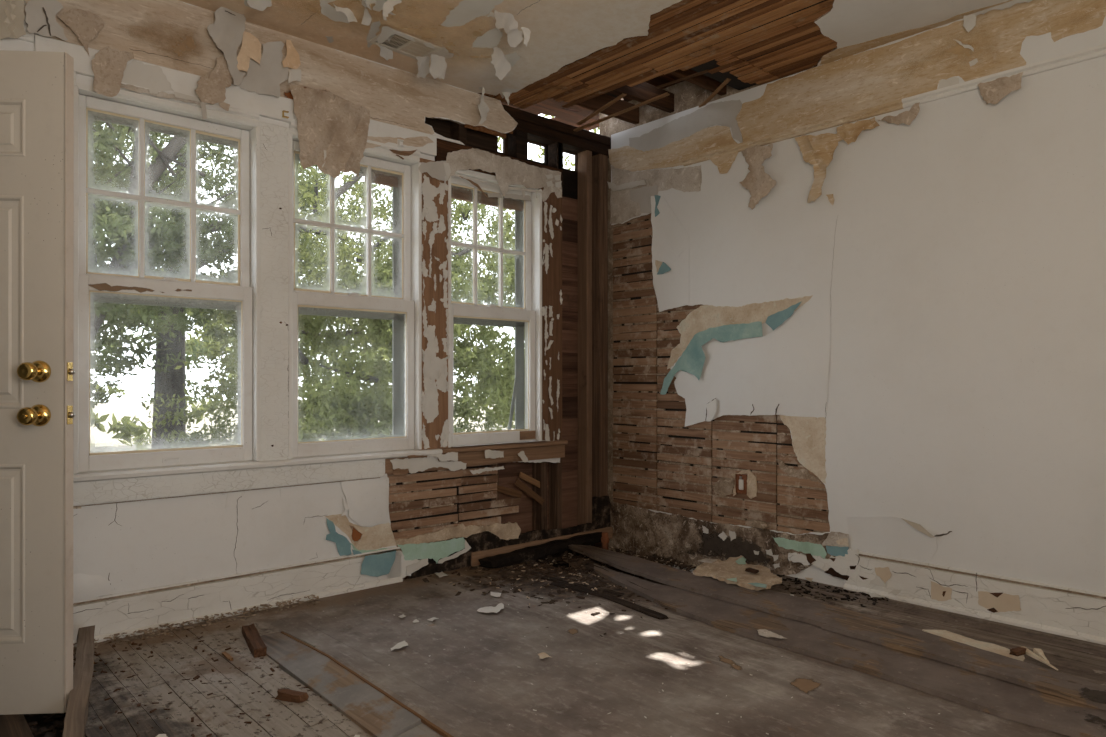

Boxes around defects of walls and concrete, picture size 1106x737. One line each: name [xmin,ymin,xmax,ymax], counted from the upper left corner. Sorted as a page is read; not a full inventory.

peeling [608,0,1106,174]
peeling [49,0,753,576]
spalling [609,295,892,598]
crack [855,554,977,603]
peeling [978,591,1021,613]